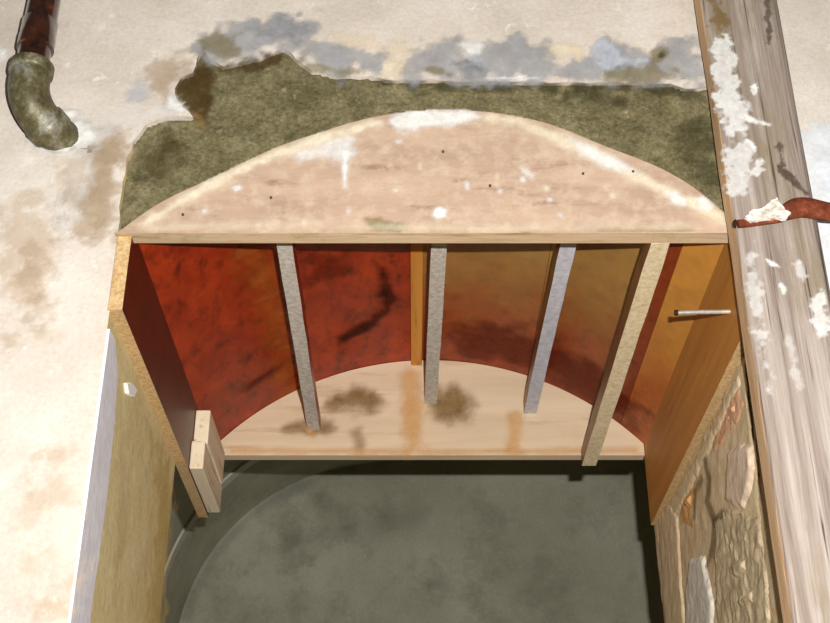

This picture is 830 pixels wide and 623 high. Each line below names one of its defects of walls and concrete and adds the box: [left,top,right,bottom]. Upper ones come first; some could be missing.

peeling [460,42,482,55]
spalling [652,47,667,62]
leakage [154,14,391,128]
leakage [403,33,705,97]
peeling [166,96,185,112]